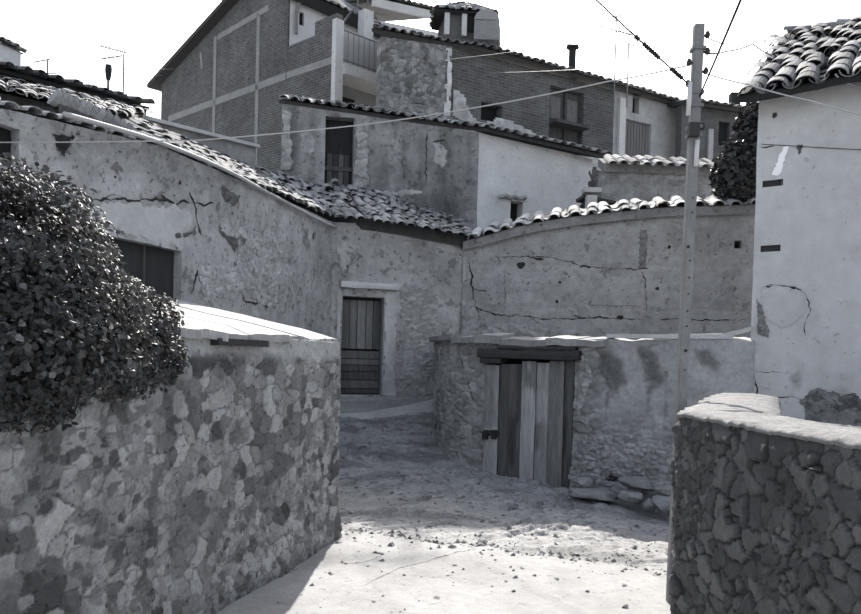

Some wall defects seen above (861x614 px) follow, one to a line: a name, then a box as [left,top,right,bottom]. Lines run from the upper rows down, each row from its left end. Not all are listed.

spalling [432,142,448,167]
spalling [379,189,422,197]
crack [466,256,744,324]
spalling [756,299,770,337]
spalling [799,388,861,427]